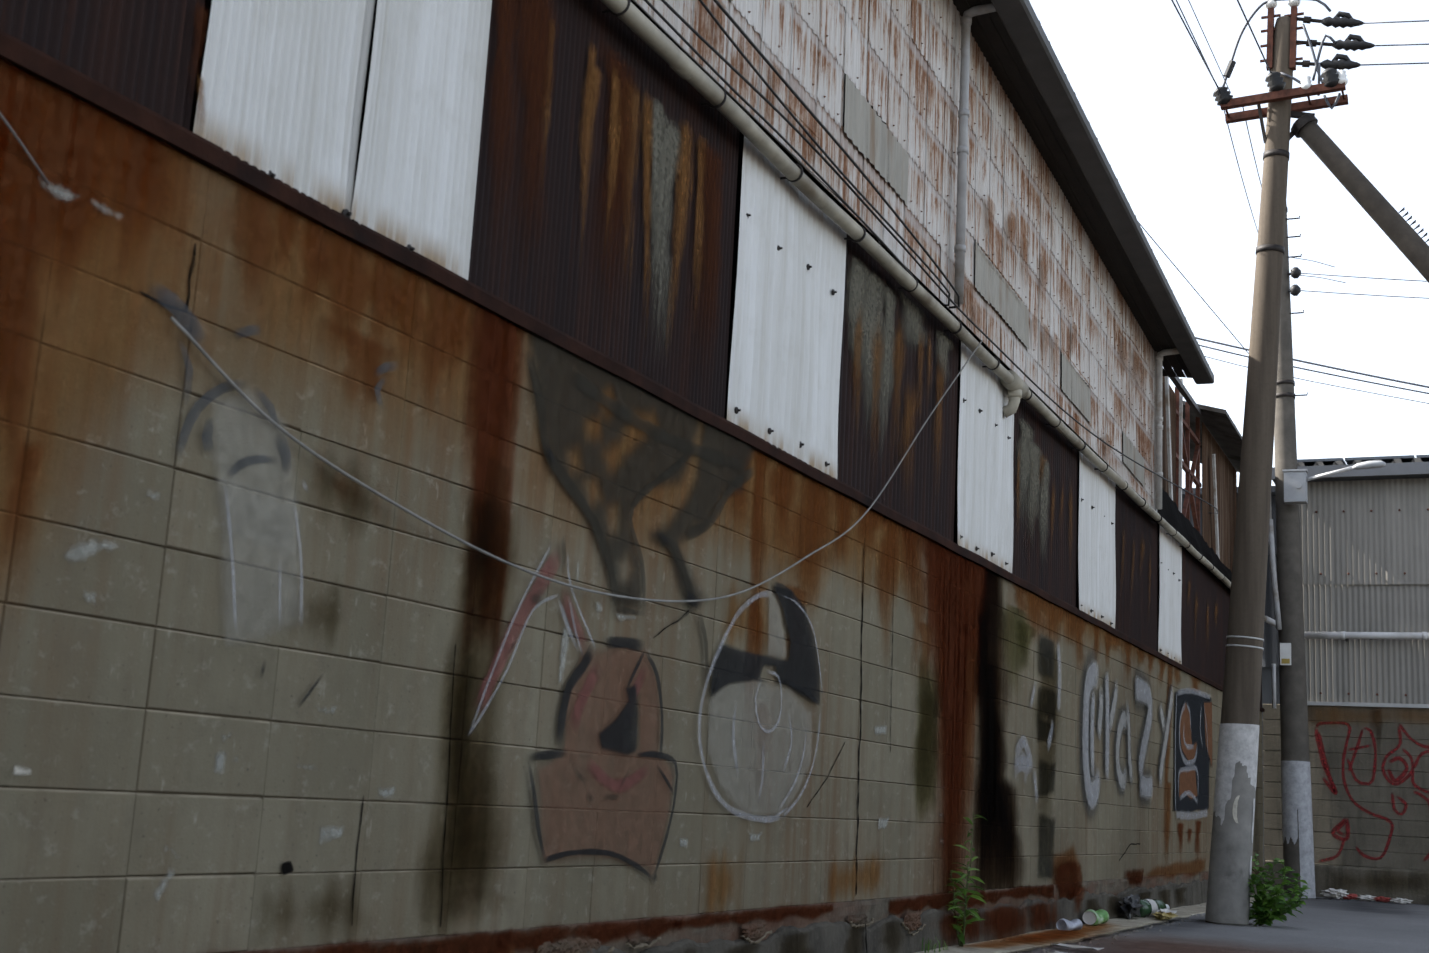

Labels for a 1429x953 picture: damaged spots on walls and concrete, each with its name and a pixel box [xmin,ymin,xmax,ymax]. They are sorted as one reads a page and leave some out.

rust [583,49,652,275]
rust [676,126,706,276]
rust [980,196,1093,390]
rust [466,303,523,648]
rust [889,534,1086,943]
damp [974,568,1021,891]
rust [1127,869,1144,885]